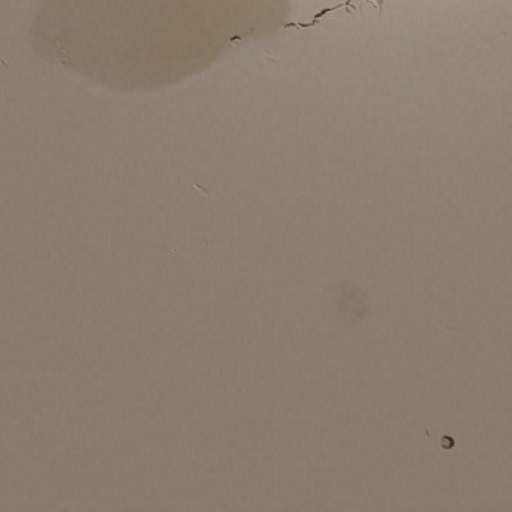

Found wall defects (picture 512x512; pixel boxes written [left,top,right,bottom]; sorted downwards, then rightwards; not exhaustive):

leakage [20,0,296,107]
crack [278,0,364,34]